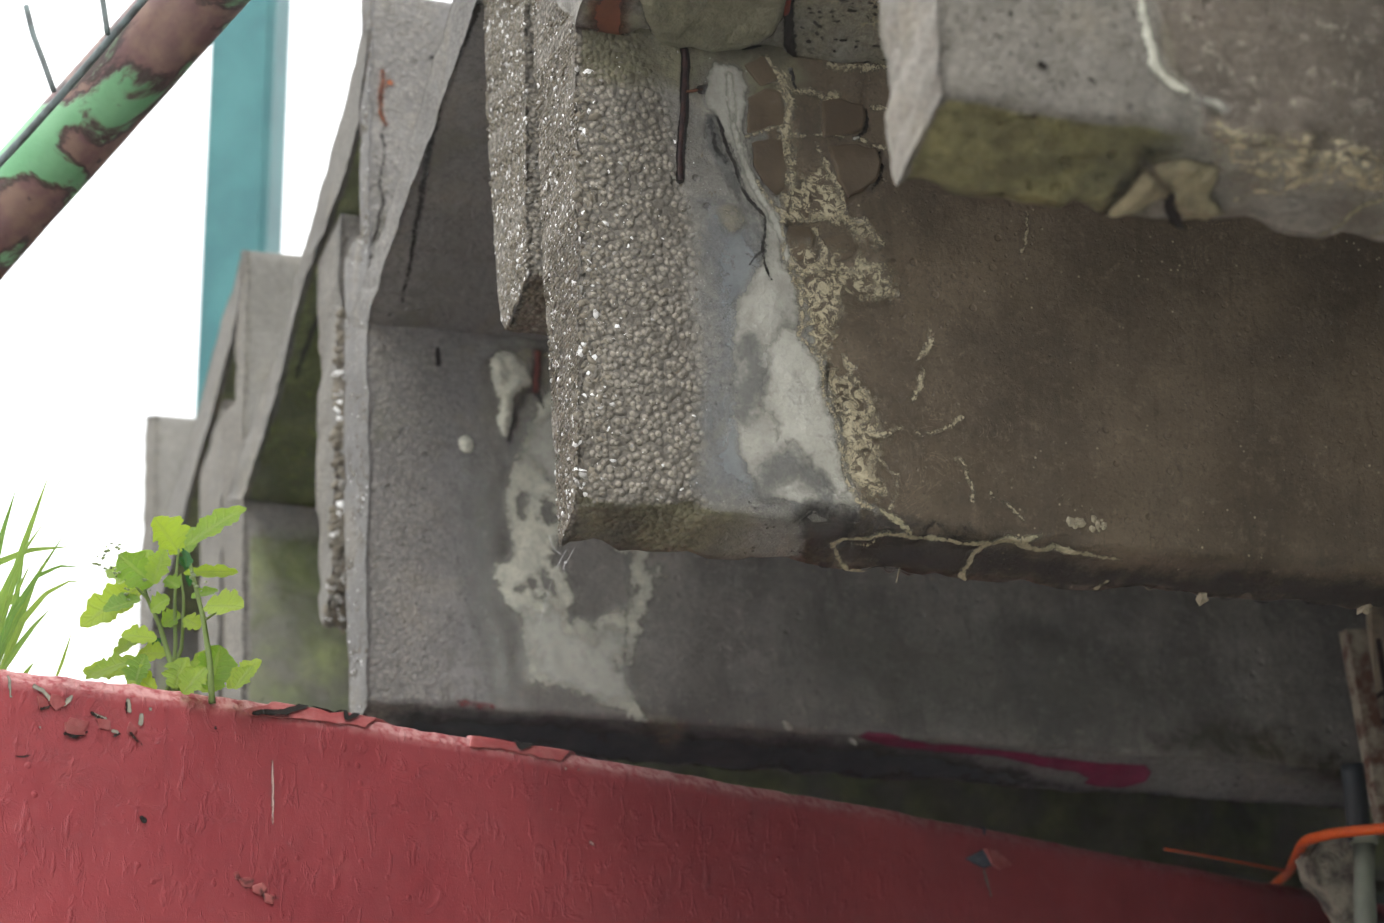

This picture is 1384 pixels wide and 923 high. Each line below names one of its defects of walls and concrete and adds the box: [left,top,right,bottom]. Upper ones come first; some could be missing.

spalling [1102,150,1226,229]
water stain [1137,0,1384,236]
water stain [704,55,1384,609]
water stain [393,346,1118,794]
peeling [32,684,152,745]